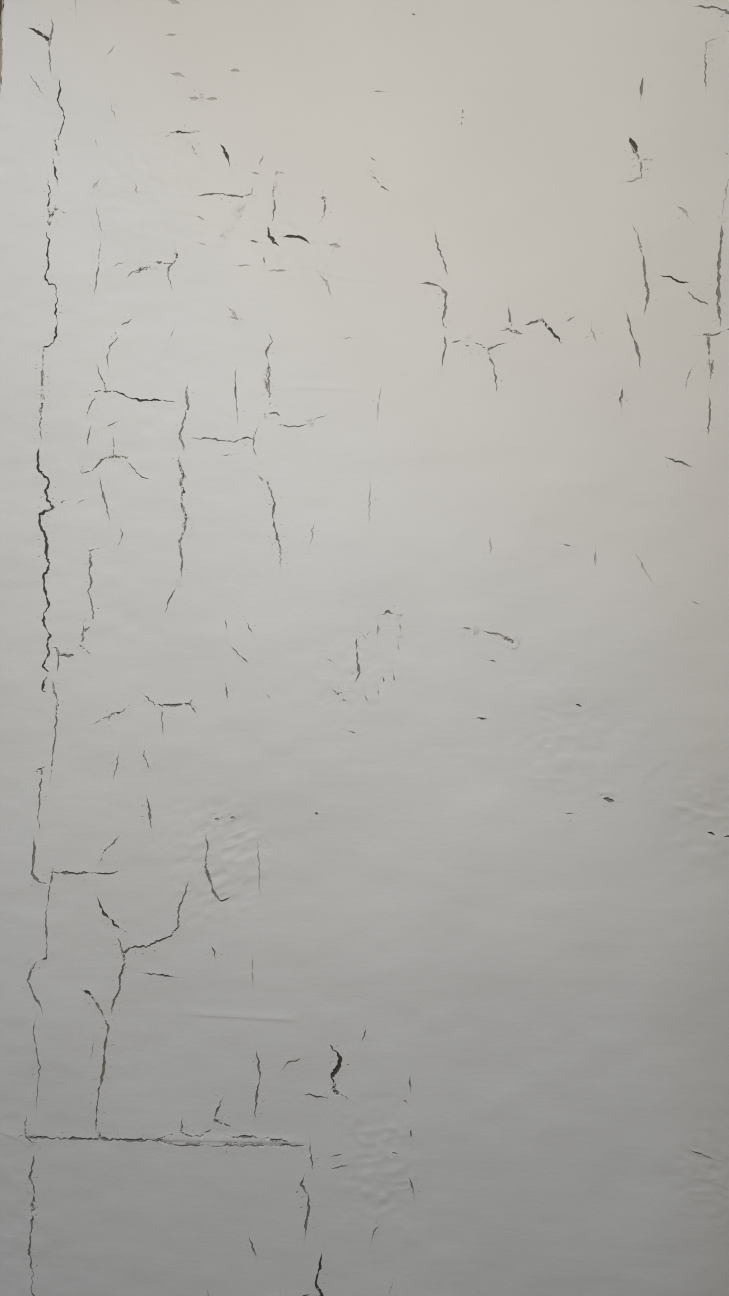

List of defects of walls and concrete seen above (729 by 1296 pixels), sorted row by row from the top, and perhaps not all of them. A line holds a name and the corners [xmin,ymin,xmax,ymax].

crack [683,0,729,99]
crack [410,68,729,477]
crack [0,0,423,1296]